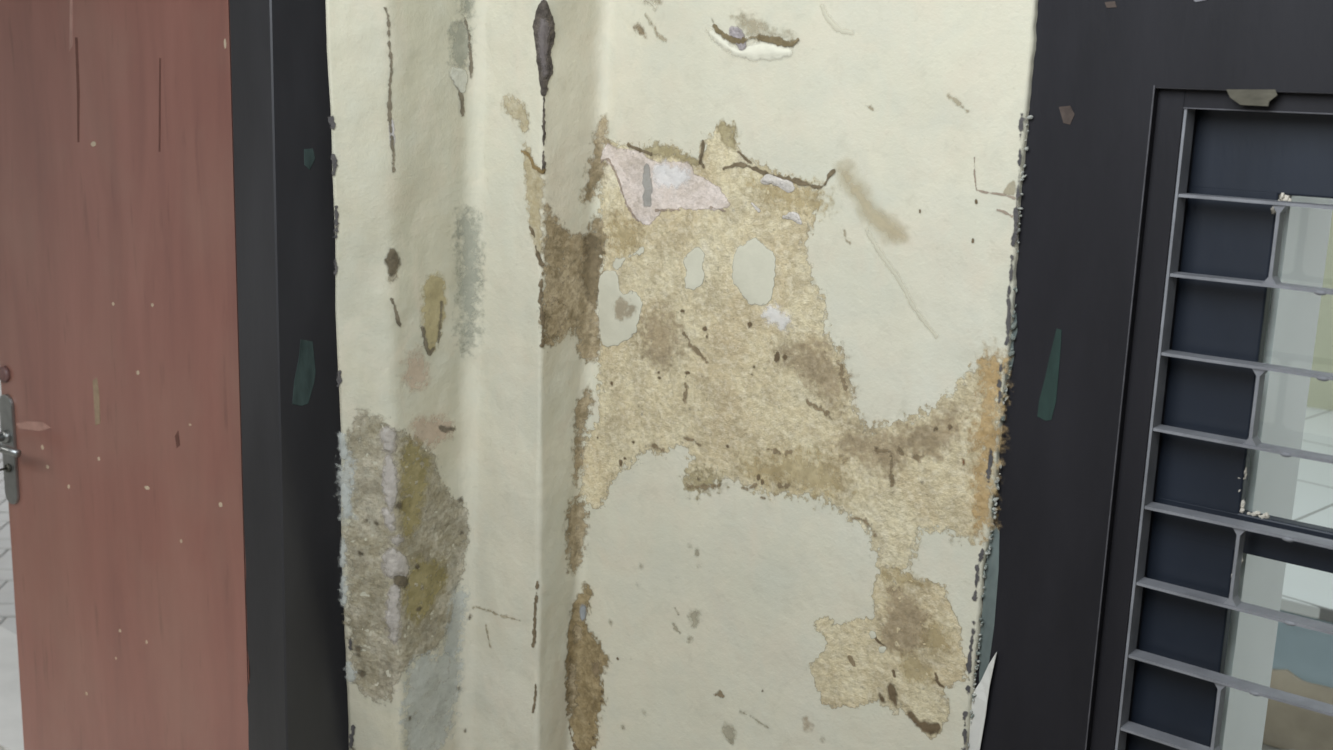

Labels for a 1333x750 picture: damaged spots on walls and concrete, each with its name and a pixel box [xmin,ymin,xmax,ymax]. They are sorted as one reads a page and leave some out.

spalling [532,0,555,96]
spalling [707,15,799,61]
spalling [974,157,1015,217]
peeling [578,121,1005,750]
peeling [338,410,471,703]